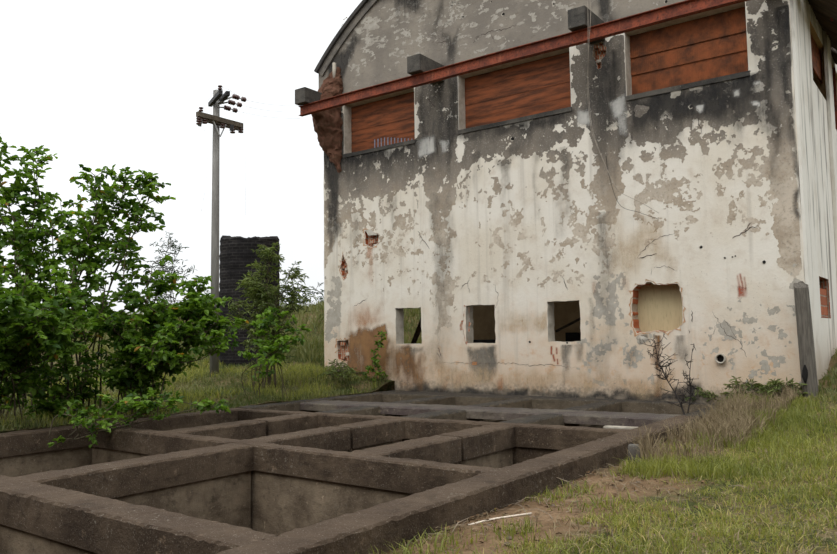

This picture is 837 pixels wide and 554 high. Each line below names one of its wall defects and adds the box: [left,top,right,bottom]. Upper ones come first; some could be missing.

peeling [324,0,802,390]
damp [775,4,792,103]